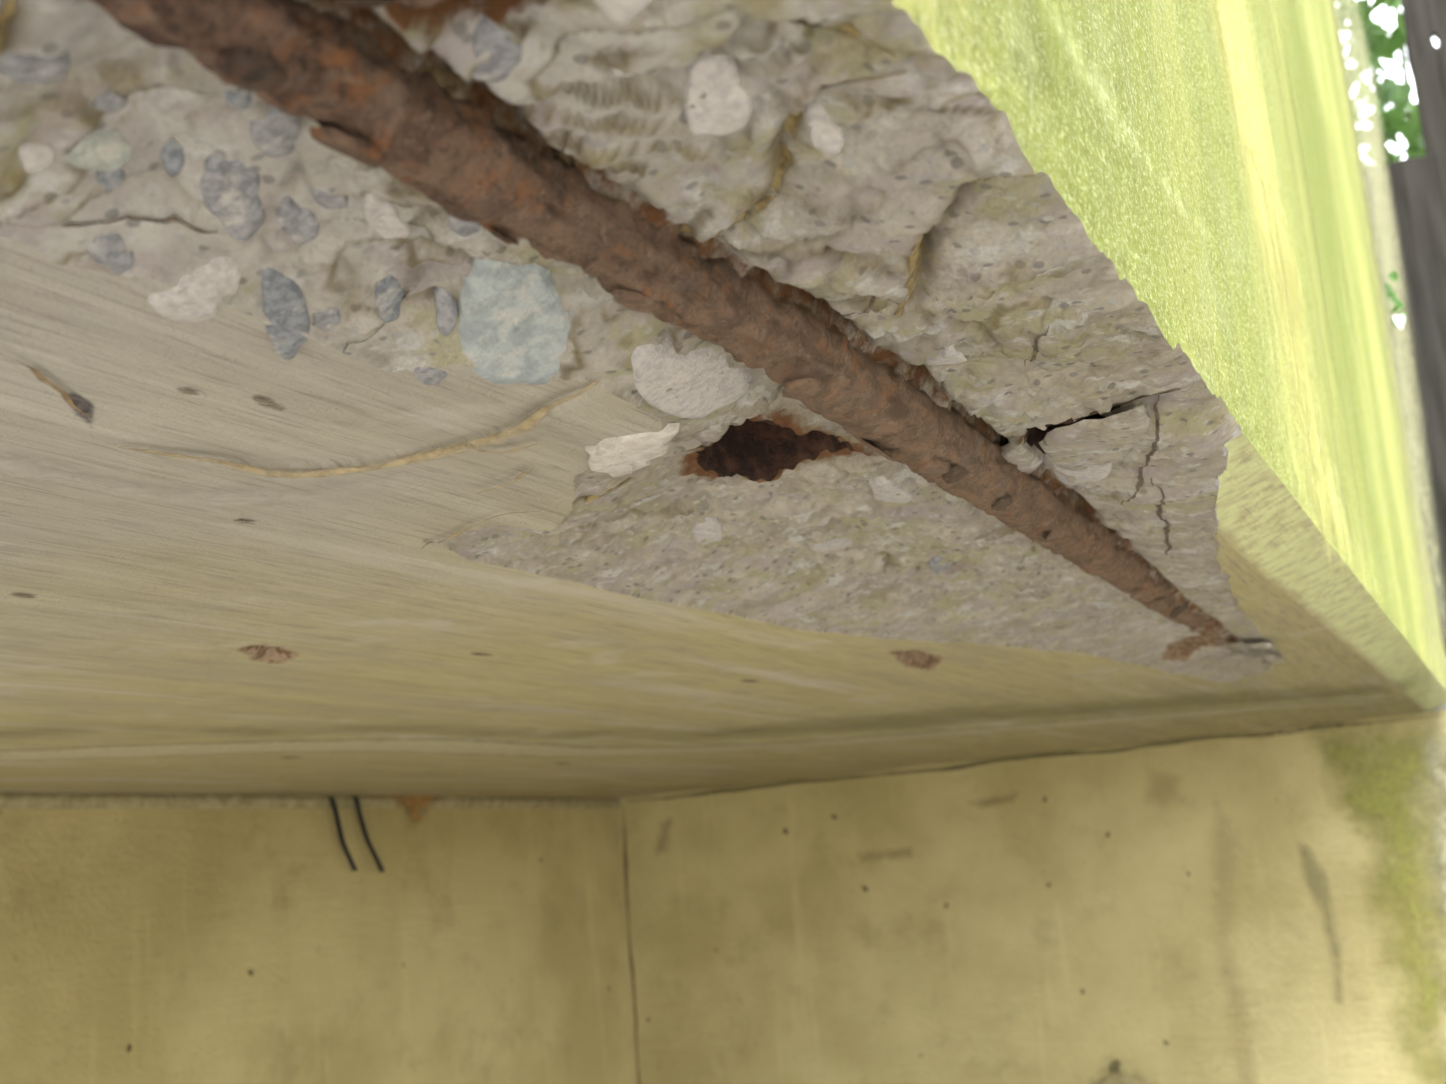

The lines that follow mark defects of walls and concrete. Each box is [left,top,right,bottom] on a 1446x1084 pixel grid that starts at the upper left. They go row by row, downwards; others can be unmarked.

crack [1,354,89,417]
crack [118,380,598,548]
crack [343,285,417,352]
spalling [0,0,1284,682]
crack [1121,394,1172,555]